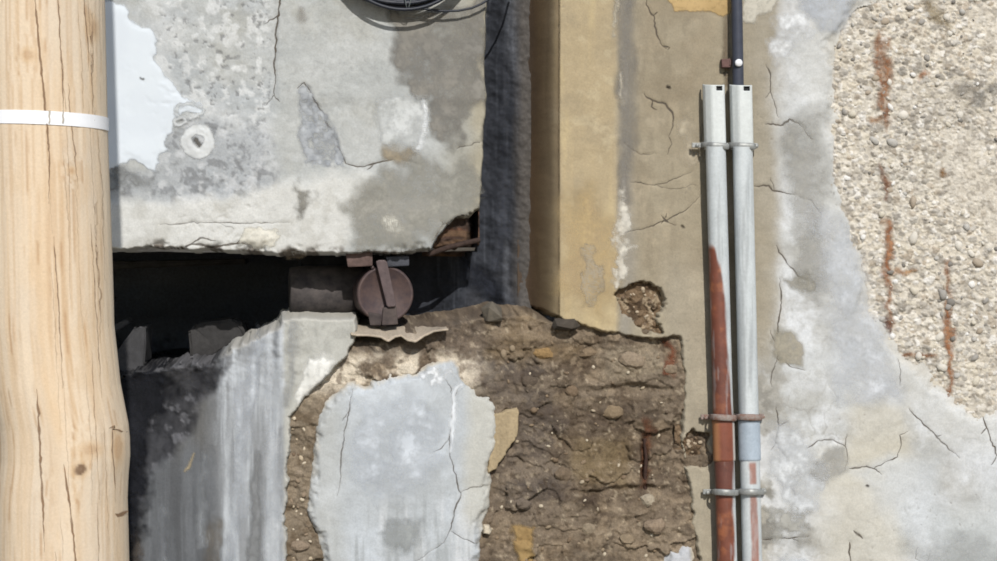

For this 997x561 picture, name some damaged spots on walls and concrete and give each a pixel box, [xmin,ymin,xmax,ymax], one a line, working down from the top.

crack [265,0,390,169]
crack [644,94,674,152]
crack [765,66,812,139]
rust [872,35,891,123]
crack [625,173,699,233]
spalling [830,0,997,421]
spalling [284,189,713,561]
rust [883,220,916,333]
rust [943,263,955,397]
crack [415,379,482,561]
crack [981,417,997,465]
leakage [129,535,142,561]